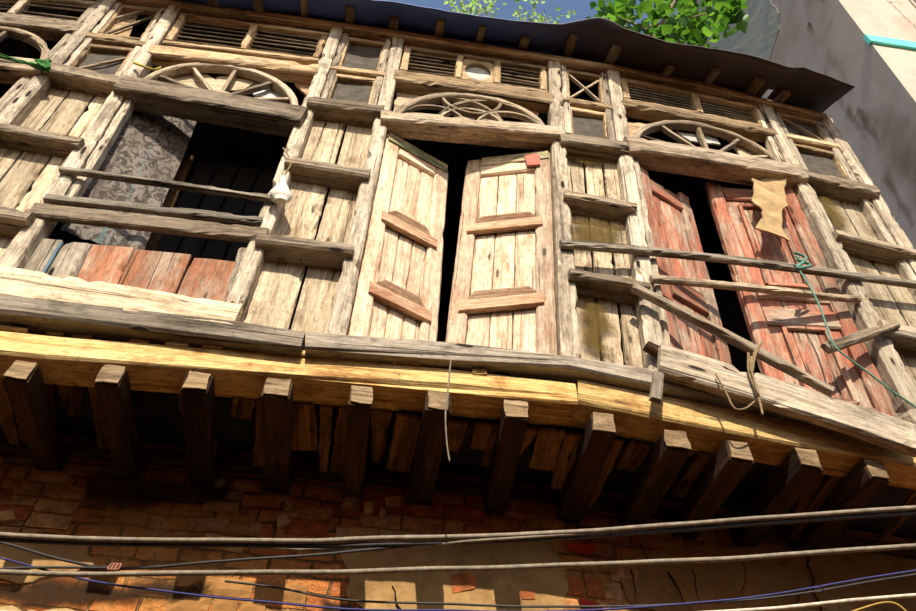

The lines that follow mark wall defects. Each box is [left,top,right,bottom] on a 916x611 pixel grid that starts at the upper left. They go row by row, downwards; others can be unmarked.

flaking render [0,456,87,534]
spalling [451,572,478,593]
spalling [519,591,535,599]
crack [630,543,700,611]
crack [795,556,830,611]